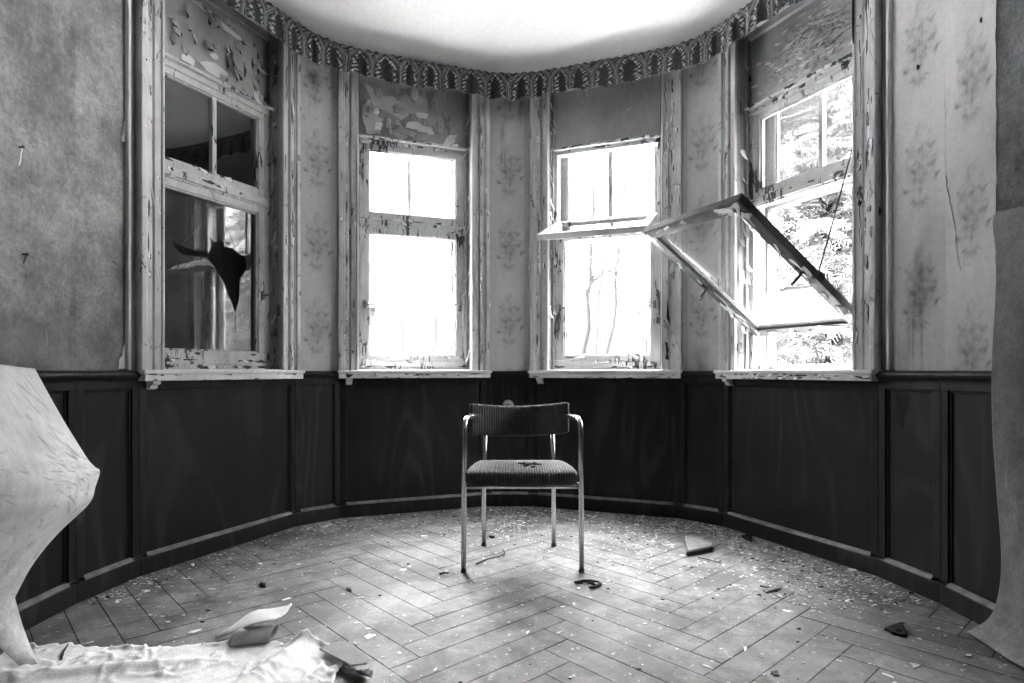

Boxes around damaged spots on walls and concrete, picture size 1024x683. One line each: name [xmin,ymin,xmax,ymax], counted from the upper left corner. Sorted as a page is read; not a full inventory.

peeling [739,32,868,115]
peeling [142,0,303,273]
peeling [345,83,485,166]
peeling [529,74,681,279]
peeling [855,97,873,171]
peeling [340,172,491,378]
peeling [148,300,297,381]